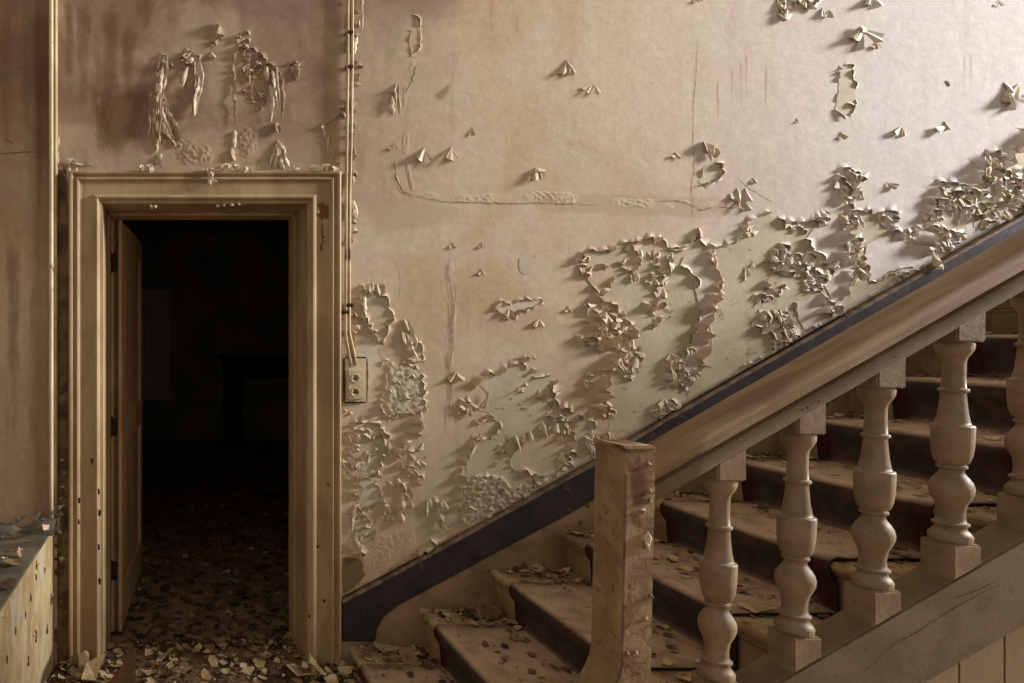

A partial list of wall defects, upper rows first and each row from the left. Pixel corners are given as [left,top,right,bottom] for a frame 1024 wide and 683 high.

peeling [777,0,834,22]
flaking render [136,0,364,243]
peeling [834,25,885,120]
peeling [1001,82,1024,111]
peeling [327,126,1024,593]